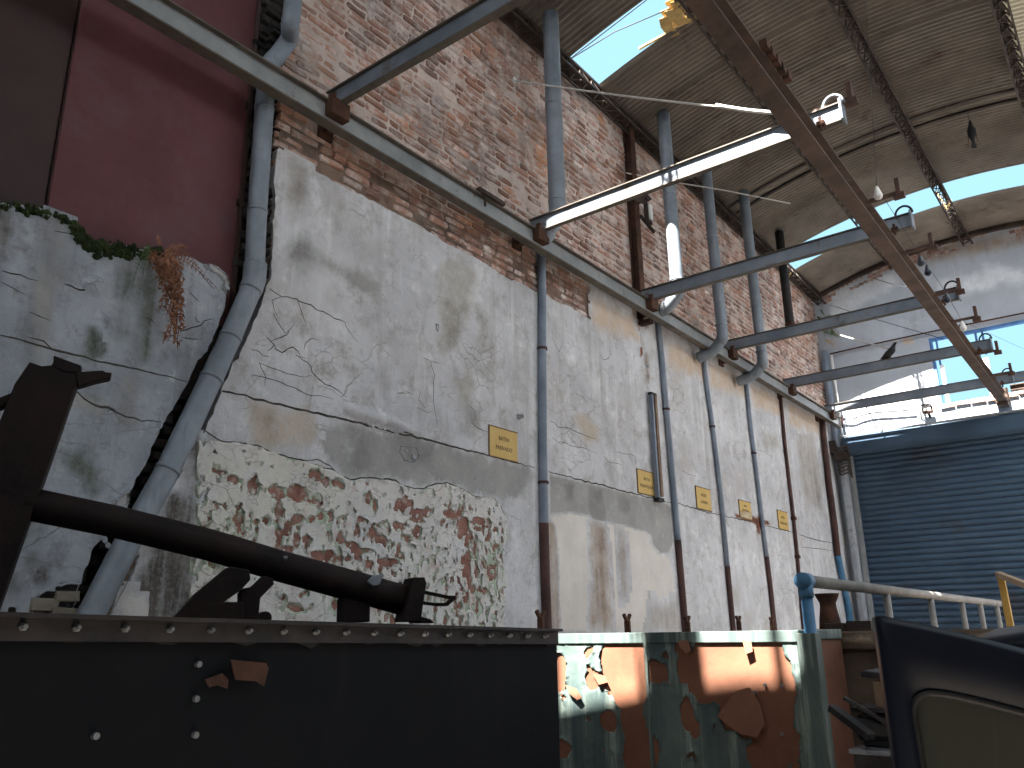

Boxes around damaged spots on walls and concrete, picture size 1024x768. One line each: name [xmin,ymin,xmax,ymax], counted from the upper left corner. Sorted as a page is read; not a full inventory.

crack [77,392,162,423]
damp [241,245,682,634]
crack [205,289,832,551]
peeling [189,440,507,627]
rust [734,512,770,537]
peeling [557,643,625,768]
peeling [643,640,765,768]
peeling [780,642,811,768]